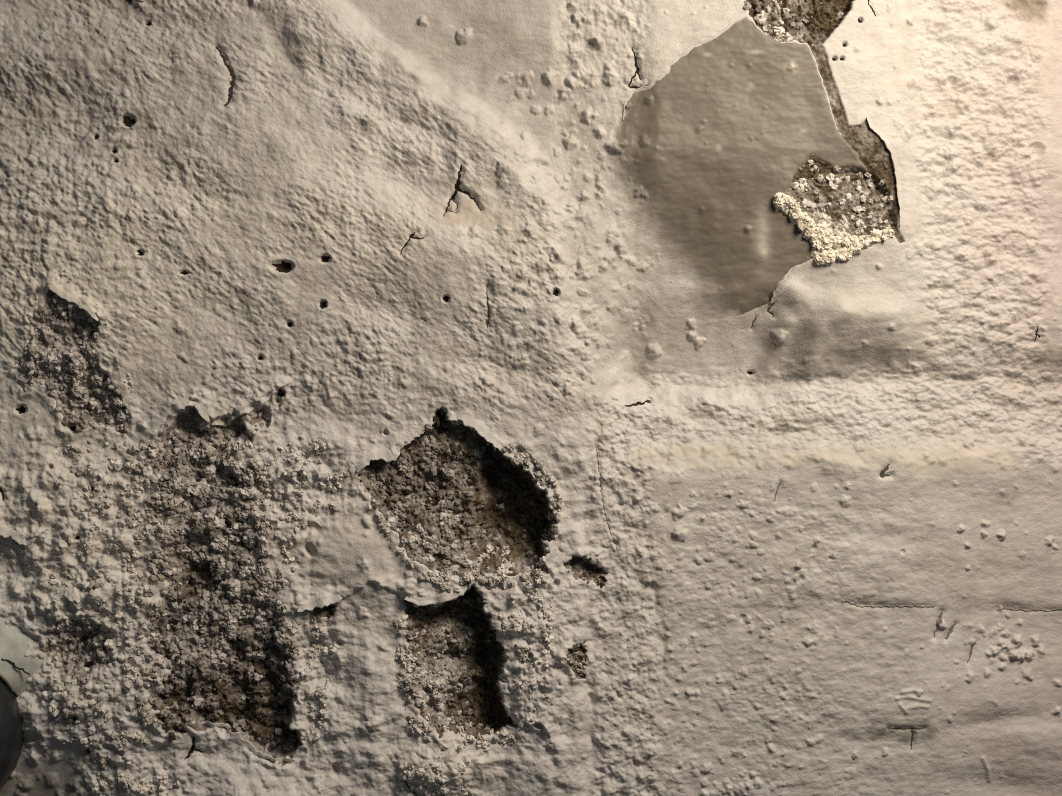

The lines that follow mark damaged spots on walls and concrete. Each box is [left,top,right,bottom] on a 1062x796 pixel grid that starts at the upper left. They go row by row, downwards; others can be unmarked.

crack [216,47,236,106]
crack [443,164,481,216]
peeling [618,0,905,315]
flaking render [14,281,130,433]
flaking render [43,584,112,688]
flaking render [123,390,342,766]
flaking render [356,408,564,752]